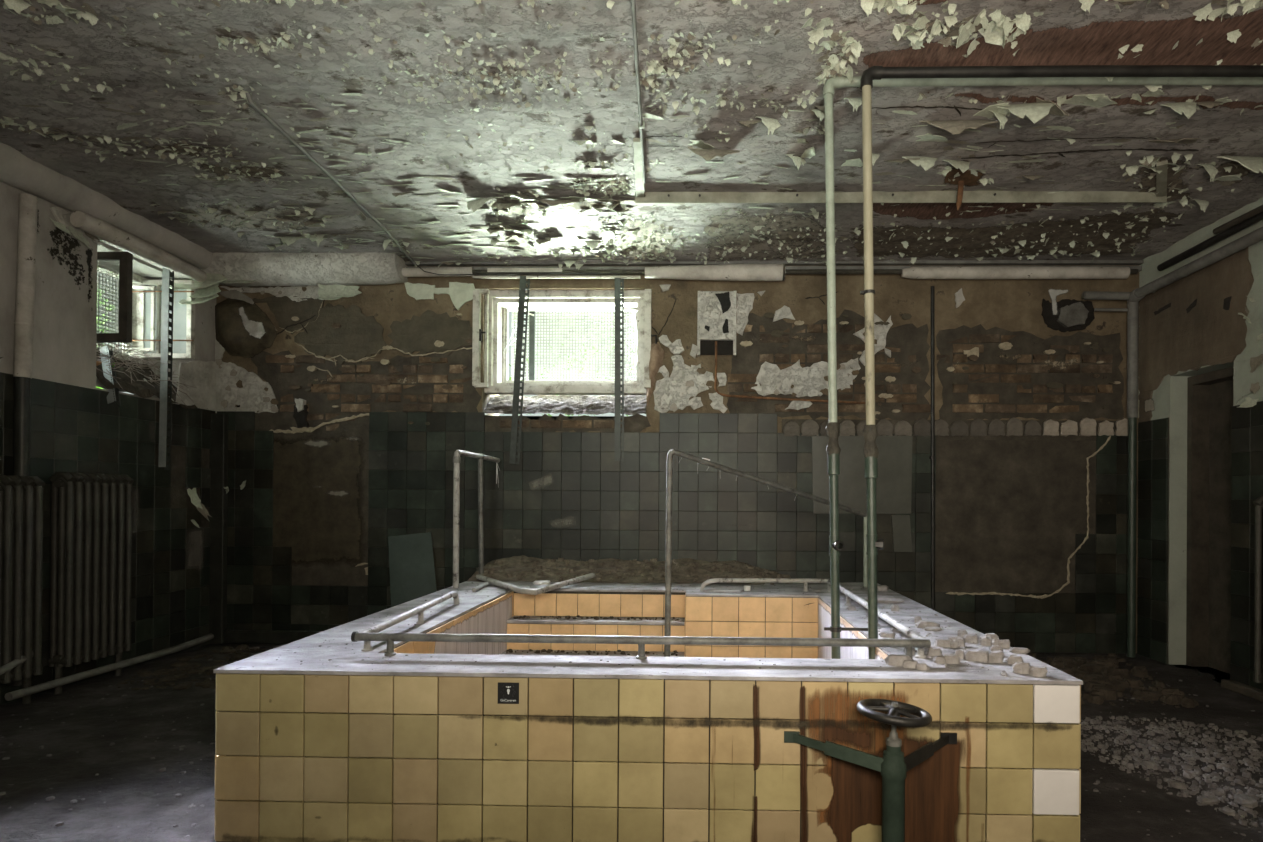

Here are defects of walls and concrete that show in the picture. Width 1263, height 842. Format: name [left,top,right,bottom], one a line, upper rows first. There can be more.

peeling [0,0,1263,270]
flaking render [170,247,1263,432]
corrosion [800,686,971,842]